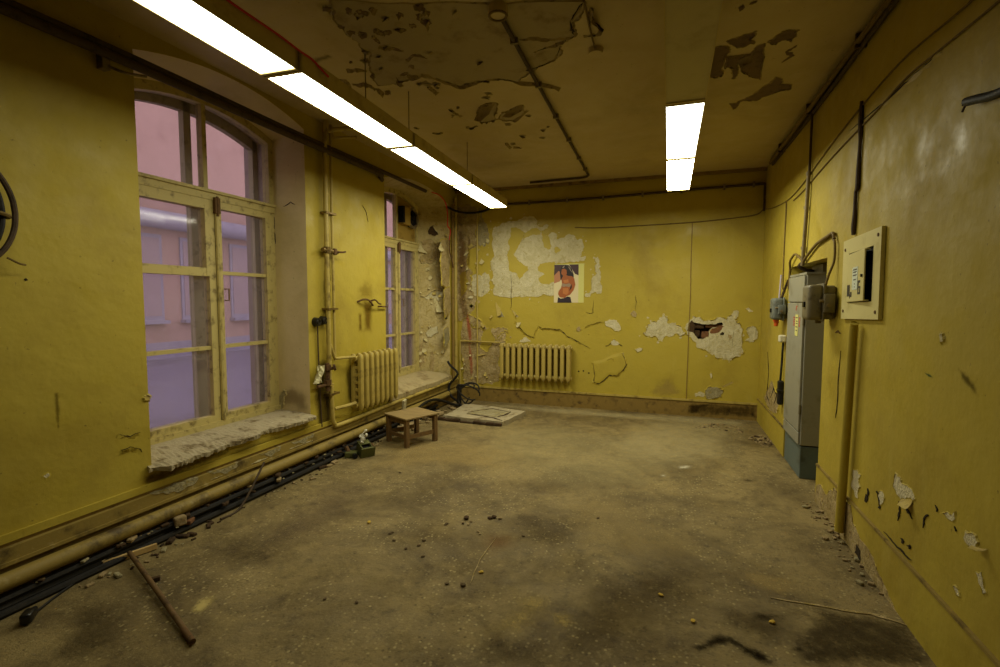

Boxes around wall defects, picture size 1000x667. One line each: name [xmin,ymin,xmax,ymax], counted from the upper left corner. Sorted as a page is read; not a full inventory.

peeling [338,3,441,98]
peeling [448,81,532,130]
peeling [710,29,800,110]
peeling [418,203,603,386]
crack [511,281,628,386]
flaking render [630,307,759,362]
peeling [878,472,916,509]
flaking render [815,469,896,612]
peeling [963,530,987,551]